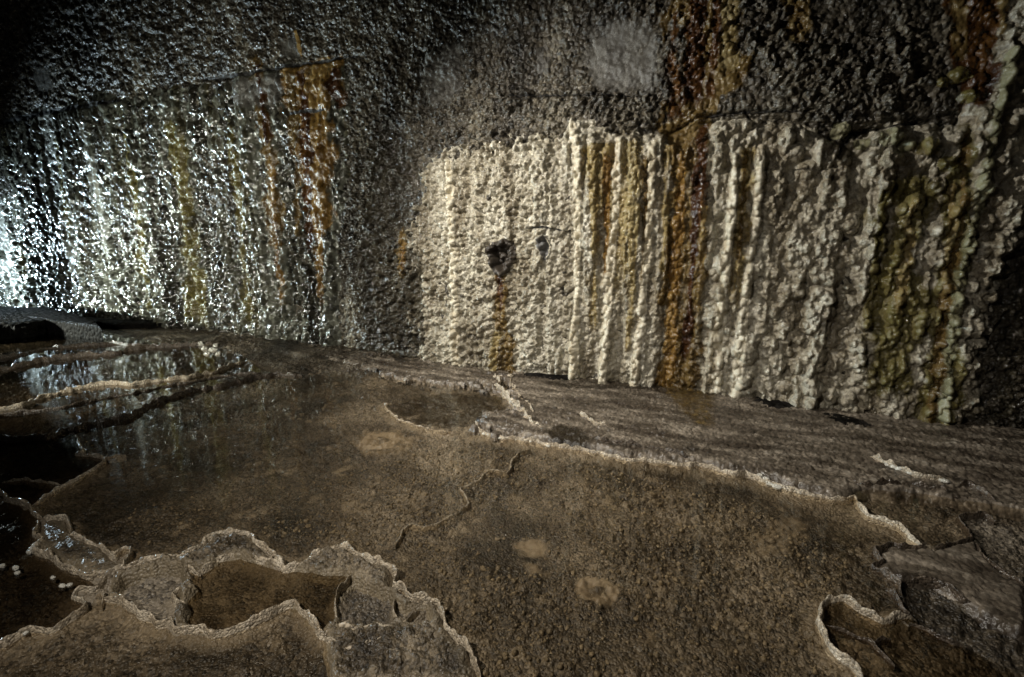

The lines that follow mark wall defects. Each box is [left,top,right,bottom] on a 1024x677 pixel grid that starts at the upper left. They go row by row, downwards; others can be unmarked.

corrosion [247,30,347,312]
spalling [485,238,516,279]
corrosion [488,274,517,374]
corrosion [581,140,649,351]
corrosion [655,0,757,424]
water stain [985,261,1024,429]